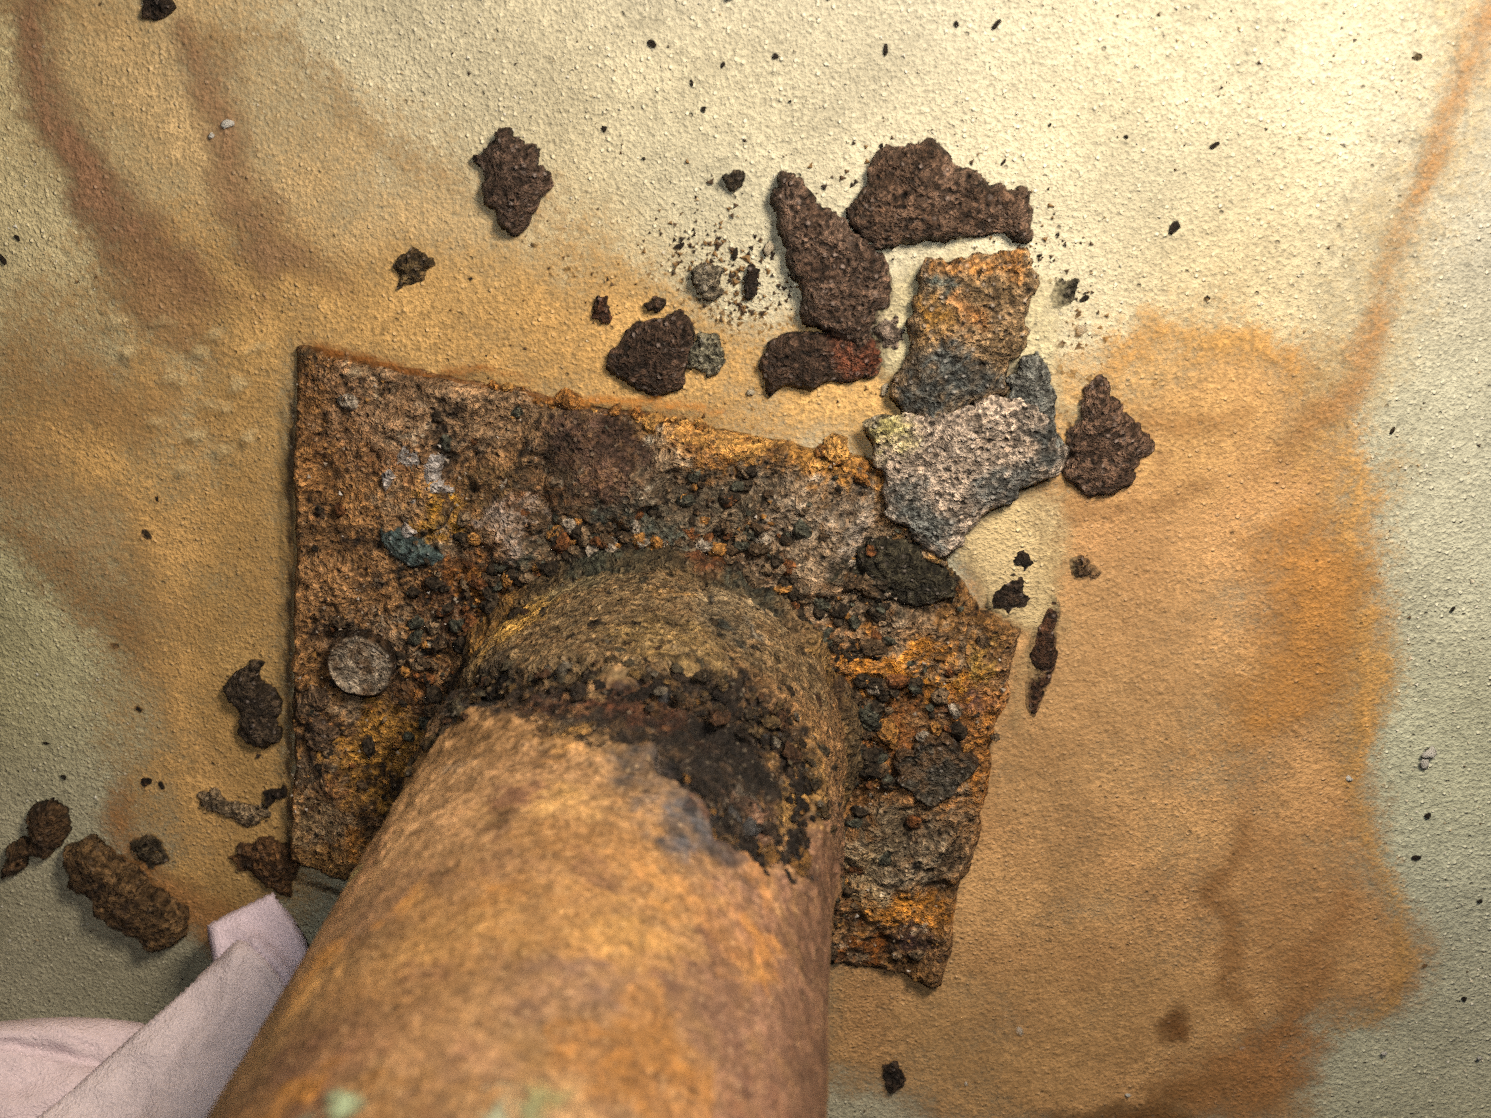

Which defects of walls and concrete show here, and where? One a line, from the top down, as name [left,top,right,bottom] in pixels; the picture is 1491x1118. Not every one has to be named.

corrosion [0,0,905,945]
peeling [862,269,1070,628]
corrosion [828,247,1432,1118]